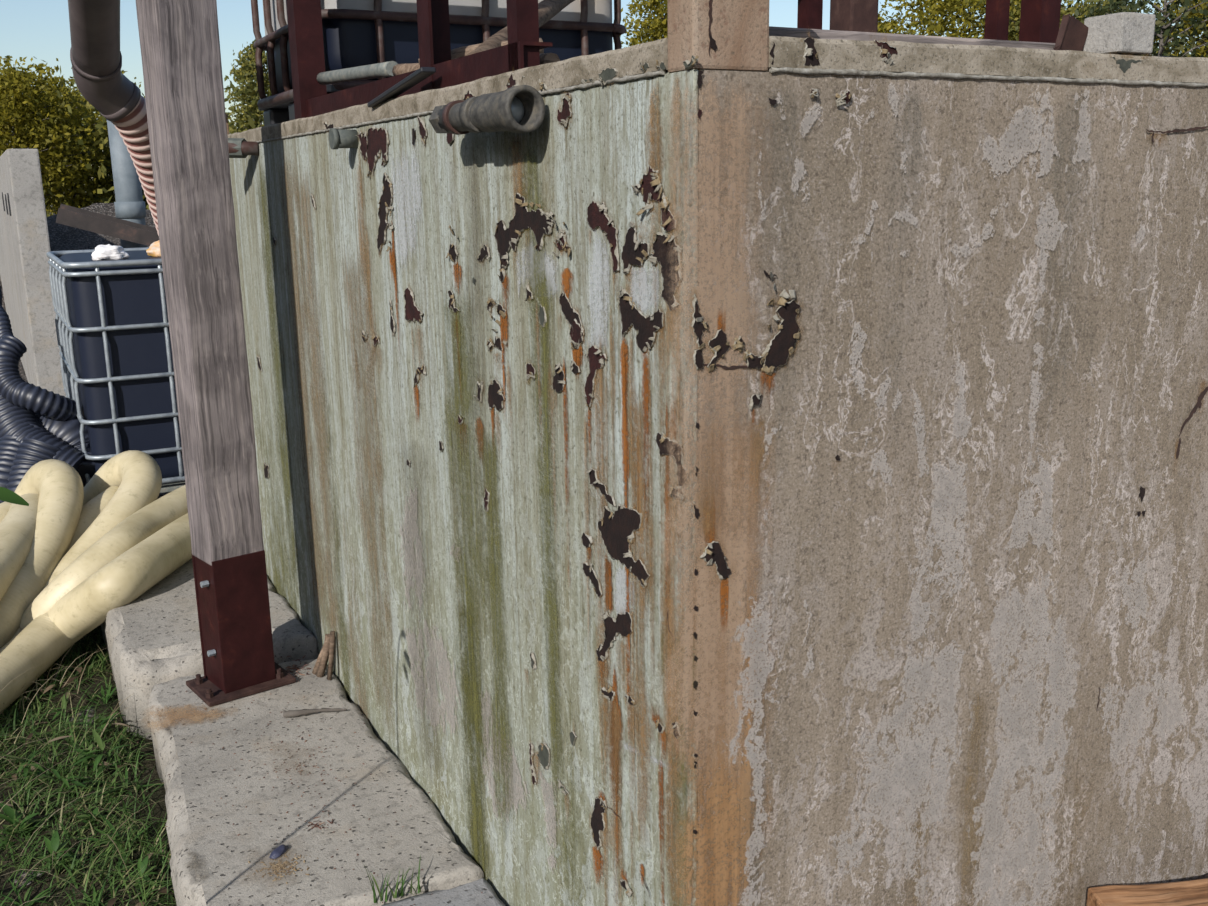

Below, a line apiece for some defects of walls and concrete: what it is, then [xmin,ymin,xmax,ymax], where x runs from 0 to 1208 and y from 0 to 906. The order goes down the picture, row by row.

damp [282,170,367,716]
damp [346,269,389,696]
peeling [356,126,395,276]
peeling [446,225,475,370]
peeling [455,379,505,458]
damp [537,278,561,786]
peeling [477,154,800,882]
rust [584,78,772,906]
damp [962,697,984,905]